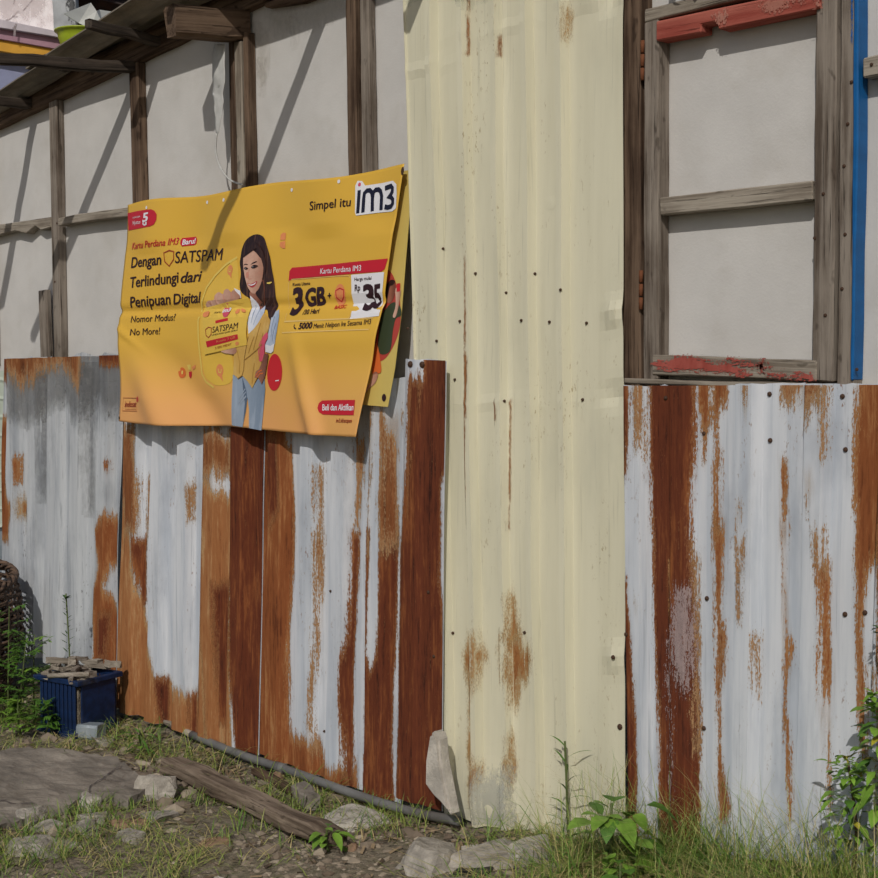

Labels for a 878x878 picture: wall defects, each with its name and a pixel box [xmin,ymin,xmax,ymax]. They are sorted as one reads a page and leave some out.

rust [1,413,27,544]
rust [4,356,84,396]
rust [99,355,119,370]
peeling [650,354,816,383]
rust [779,385,834,465]
rust [92,360,445,811]
rust [464,633,488,794]
rust [498,594,531,708]
rust [623,385,764,853]
rust [780,456,796,824]
rust [806,518,833,706]
rust [851,385,878,776]